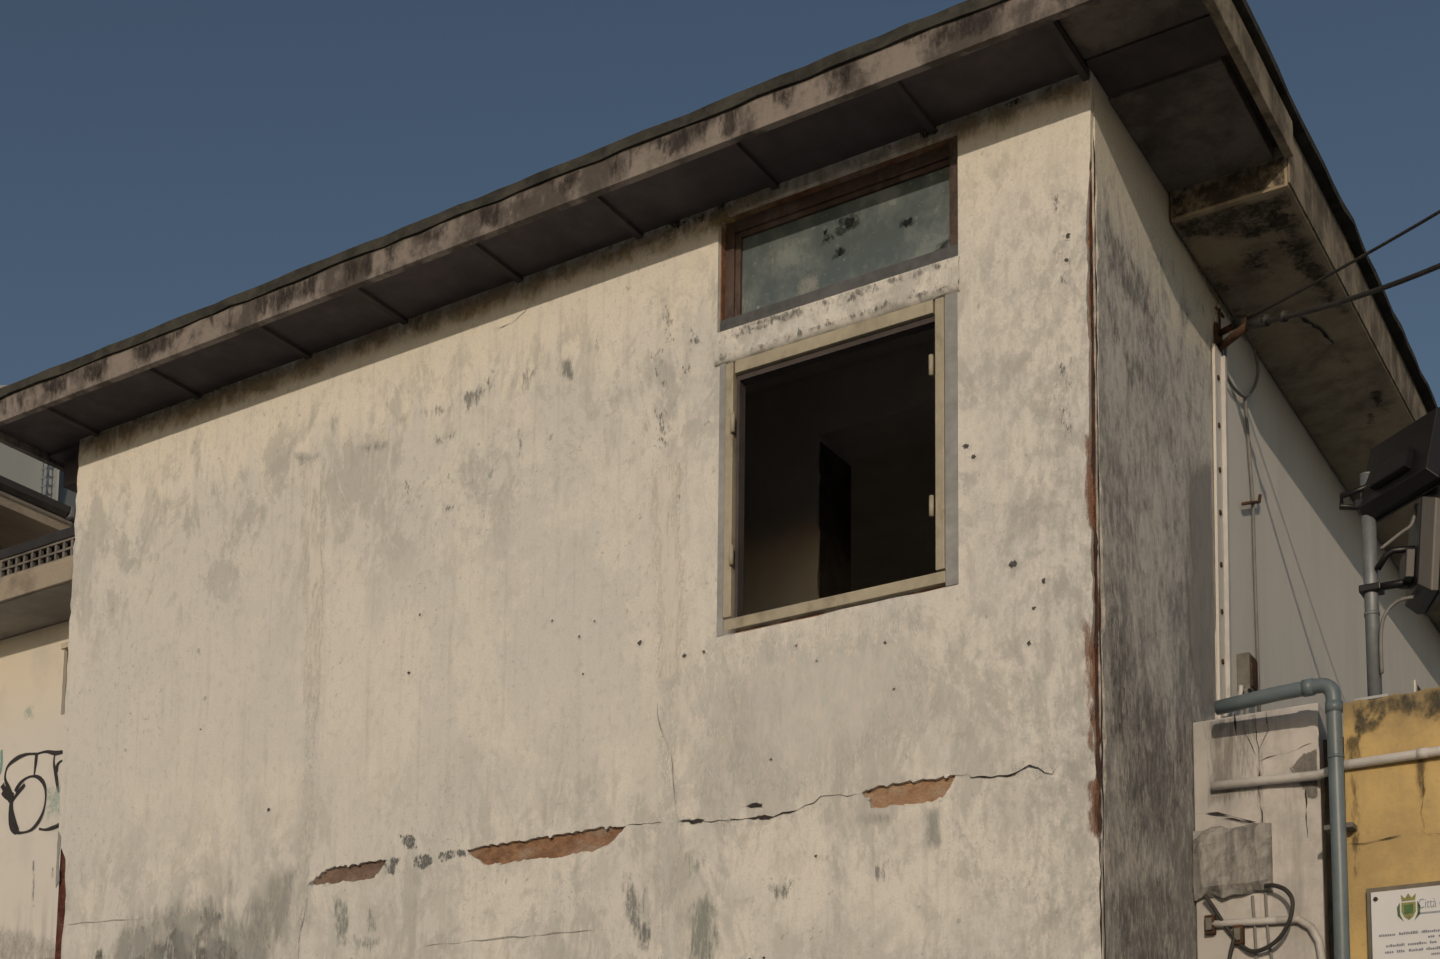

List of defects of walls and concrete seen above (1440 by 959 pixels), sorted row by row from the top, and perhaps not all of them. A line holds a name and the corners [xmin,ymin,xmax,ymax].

water stain [1172,156,1348,313]
water stain [1347,690,1440,759]
crack [629,705,863,825]
spalling [864,775,955,808]
water stain [1417,759,1425,792]
spalling [312,825,624,885]
water stain [96,875,291,959]